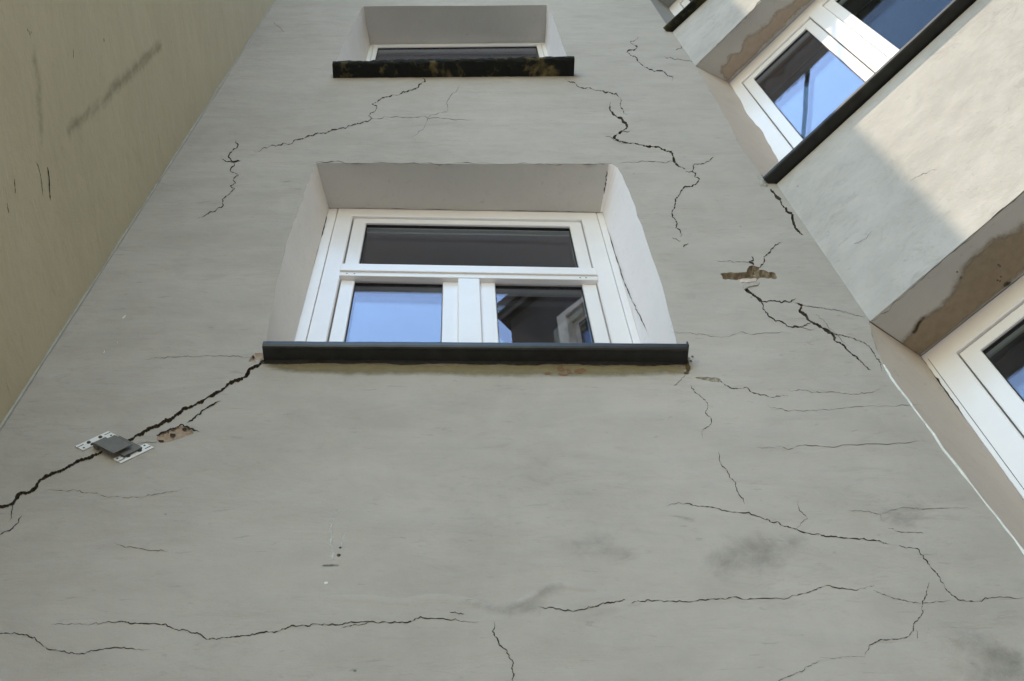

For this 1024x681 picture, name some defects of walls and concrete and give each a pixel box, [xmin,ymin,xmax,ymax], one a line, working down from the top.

peeling [721,0,810,80]
crack [203,78,464,217]
crack [322,81,713,247]
spalling [721,265,777,290]
crack [680,189,1024,429]
spalling [157,426,194,443]
crack [128,355,265,443]
crack [0,451,173,535]
crack [542,452,1019,681]
crack [0,612,515,679]